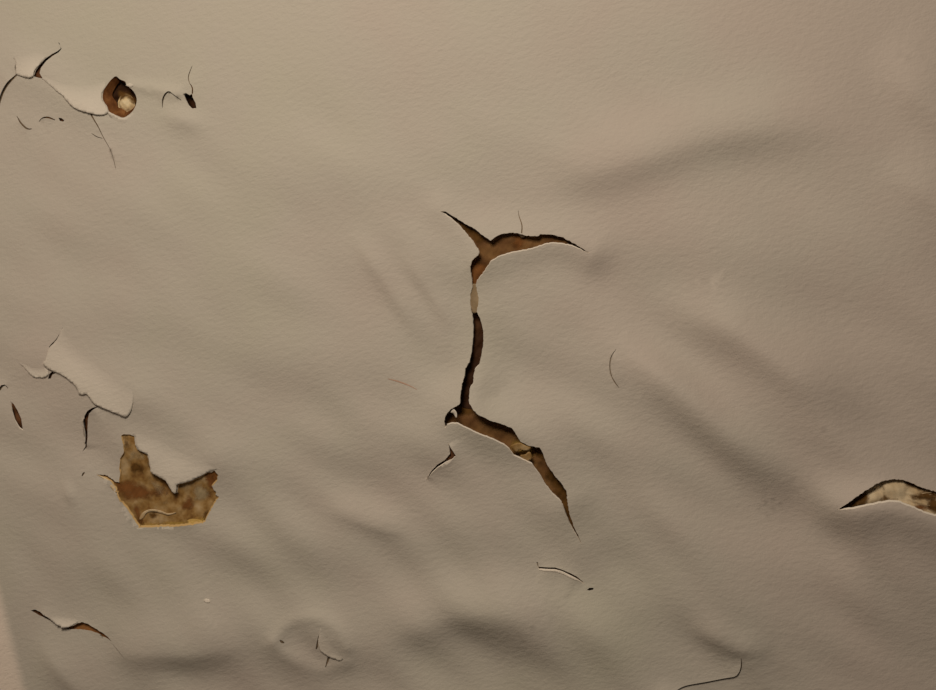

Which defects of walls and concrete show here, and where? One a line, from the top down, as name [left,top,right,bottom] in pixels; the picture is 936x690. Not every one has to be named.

peeling [0,48,134,168]
peeling [10,401,23,430]
peeling [20,328,134,451]
crack [427,211,589,542]
spalling [98,434,219,528]
crack [838,479,936,516]
crack [536,562,593,590]
crack [678,659,742,690]